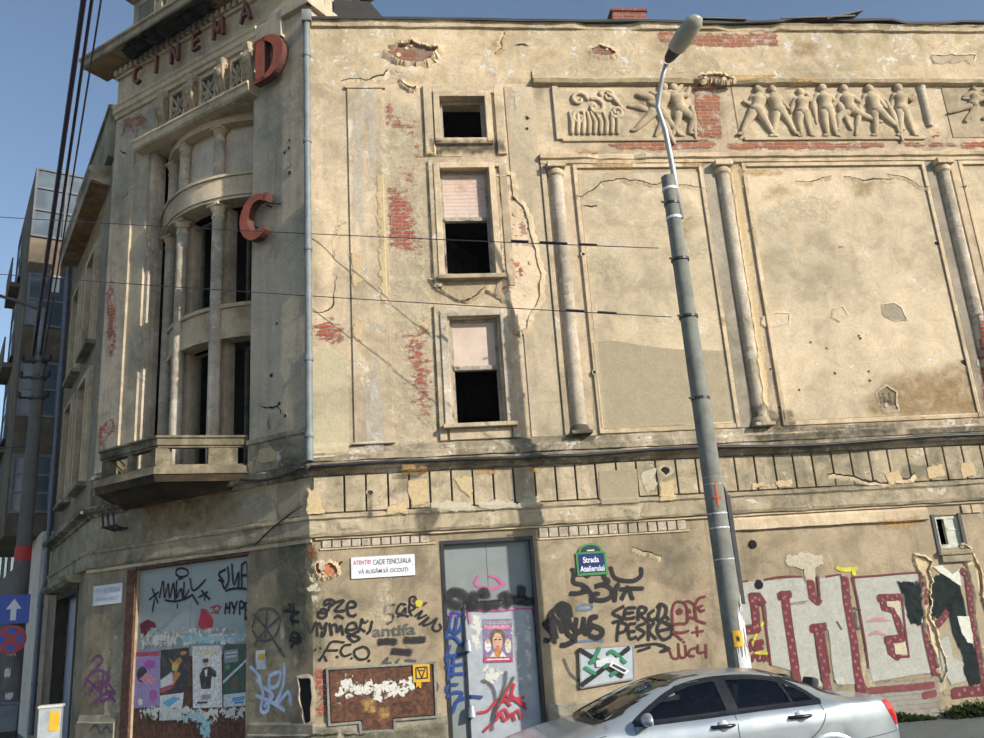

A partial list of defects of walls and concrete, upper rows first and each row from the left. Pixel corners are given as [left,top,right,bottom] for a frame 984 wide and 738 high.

flaking render [381,36,445,69]
flaking render [690,30,779,48]
crack [341,68,415,94]
flaking render [608,71,884,150]
crack [573,178,704,207]
crack [796,174,929,191]
flaking render [353,78,547,451]
flaking render [312,317,364,345]
flaking render [958,313,984,398]
leakage [752,406,898,441]
crack [828,472,917,488]
flaking render [307,559,341,607]